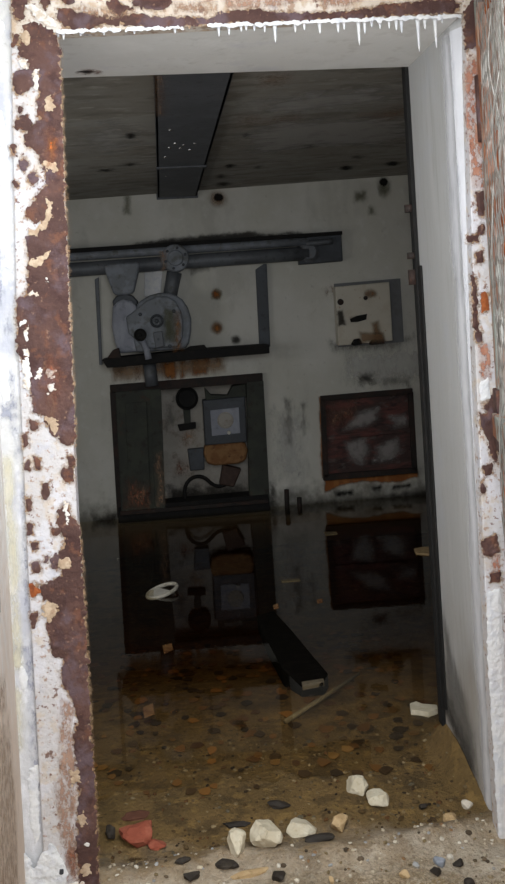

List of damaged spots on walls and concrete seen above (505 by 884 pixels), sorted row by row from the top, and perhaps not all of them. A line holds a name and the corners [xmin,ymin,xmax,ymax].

damp [56,25,184,35]
efflorescence [0,110,13,268]
corrosion [464,59,486,264]
corrosion [9,0,476,492]
corrosion [469,274,491,378]
damp [207,13,492,811]
corrosion [476,393,499,496]
corrosion [480,533,502,583]
damp [14,609,28,718]
corrosion [23,455,100,884]
efflorescence [27,765,41,843]